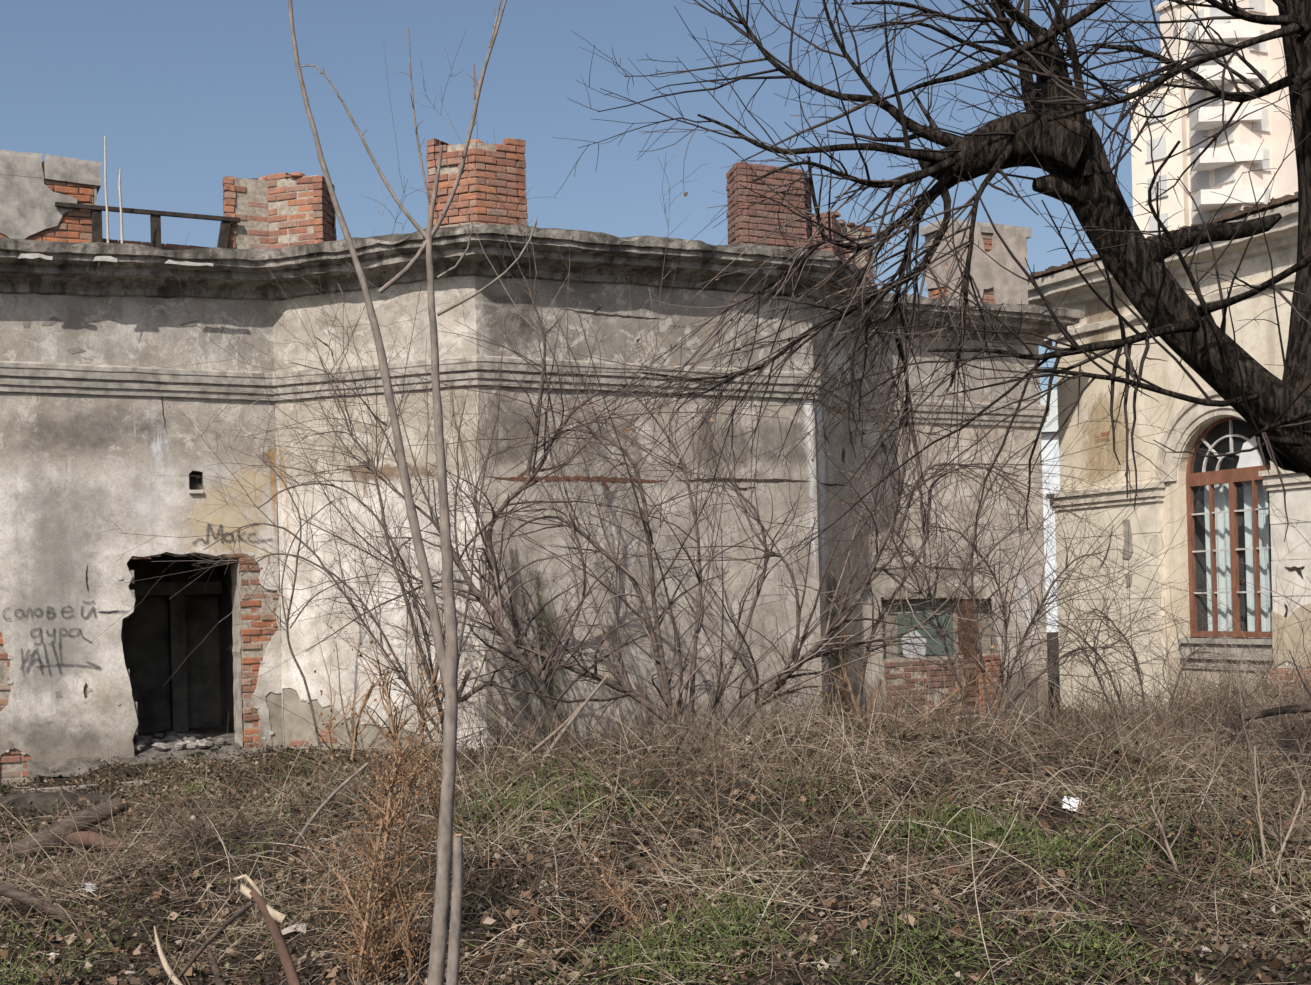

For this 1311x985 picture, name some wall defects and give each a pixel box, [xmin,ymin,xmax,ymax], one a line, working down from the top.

spalling [0,632,13,712]
spalling [117,542,421,753]
peeling [1270,603,1311,698]
spalling [0,741,33,788]